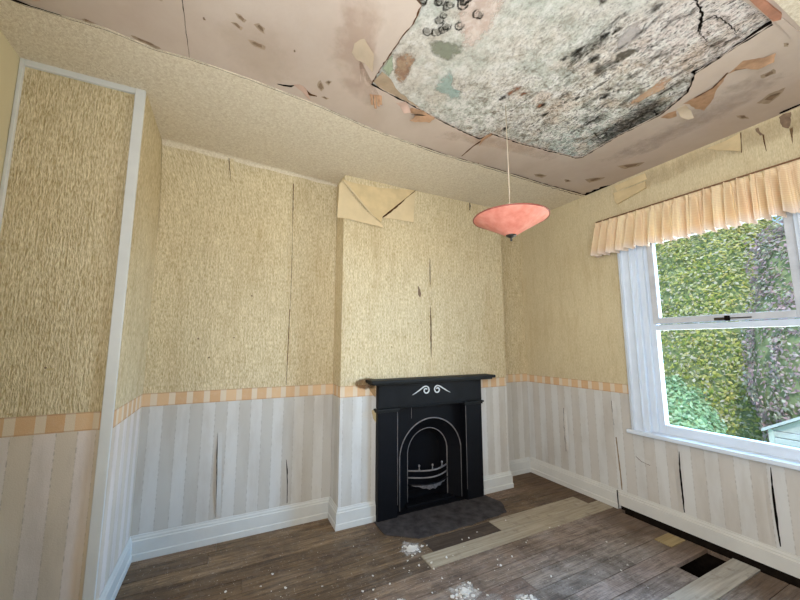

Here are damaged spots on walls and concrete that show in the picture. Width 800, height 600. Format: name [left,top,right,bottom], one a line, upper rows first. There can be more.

peeling [231,13,265,33]
crack [694,0,737,45]
flaking render [352,0,776,158]
peeling [757,87,786,104]